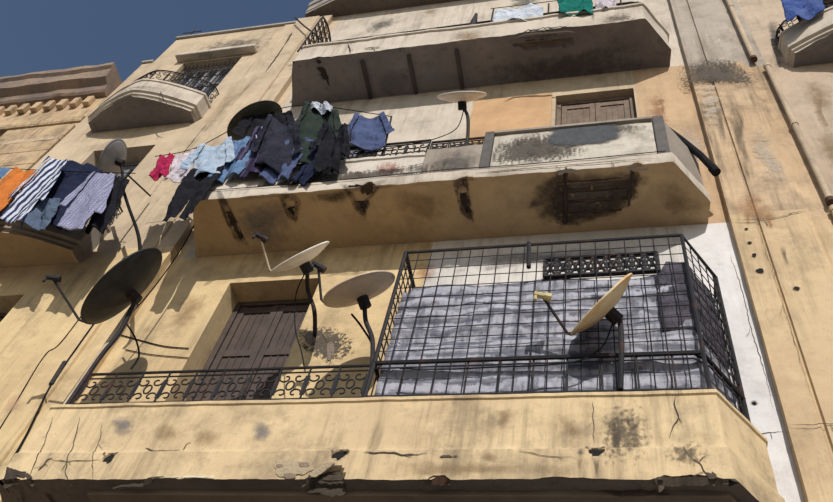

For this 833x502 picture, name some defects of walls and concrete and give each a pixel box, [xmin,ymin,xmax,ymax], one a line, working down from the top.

damp [549,124,645,145]
crack [746,211,812,396]
crack [731,260,773,407]
crack [28,417,102,485]
damp [606,407,648,455]
crack [669,399,712,478]
crack [762,423,833,437]
spalling [275,459,346,497]
spalling [599,472,729,496]